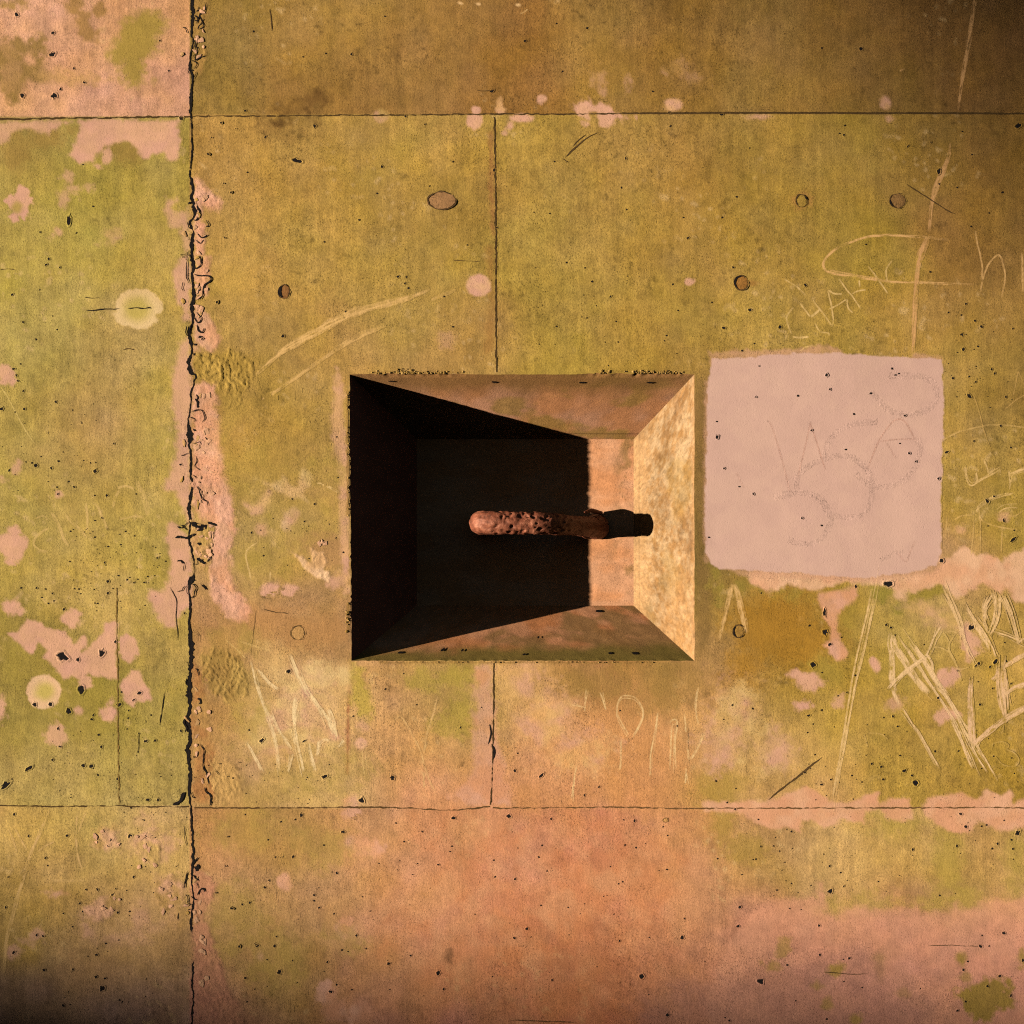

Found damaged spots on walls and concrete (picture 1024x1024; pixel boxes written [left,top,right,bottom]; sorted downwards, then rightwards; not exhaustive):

peeling [0,112,185,243]
crack [160,0,219,932]
spalling [85,171,299,632]
peeling [0,594,154,752]
peeling [681,664,1024,838]
peeling [746,521,1024,664]
spalling [2,660,244,1024]
crack [188,962,196,1024]